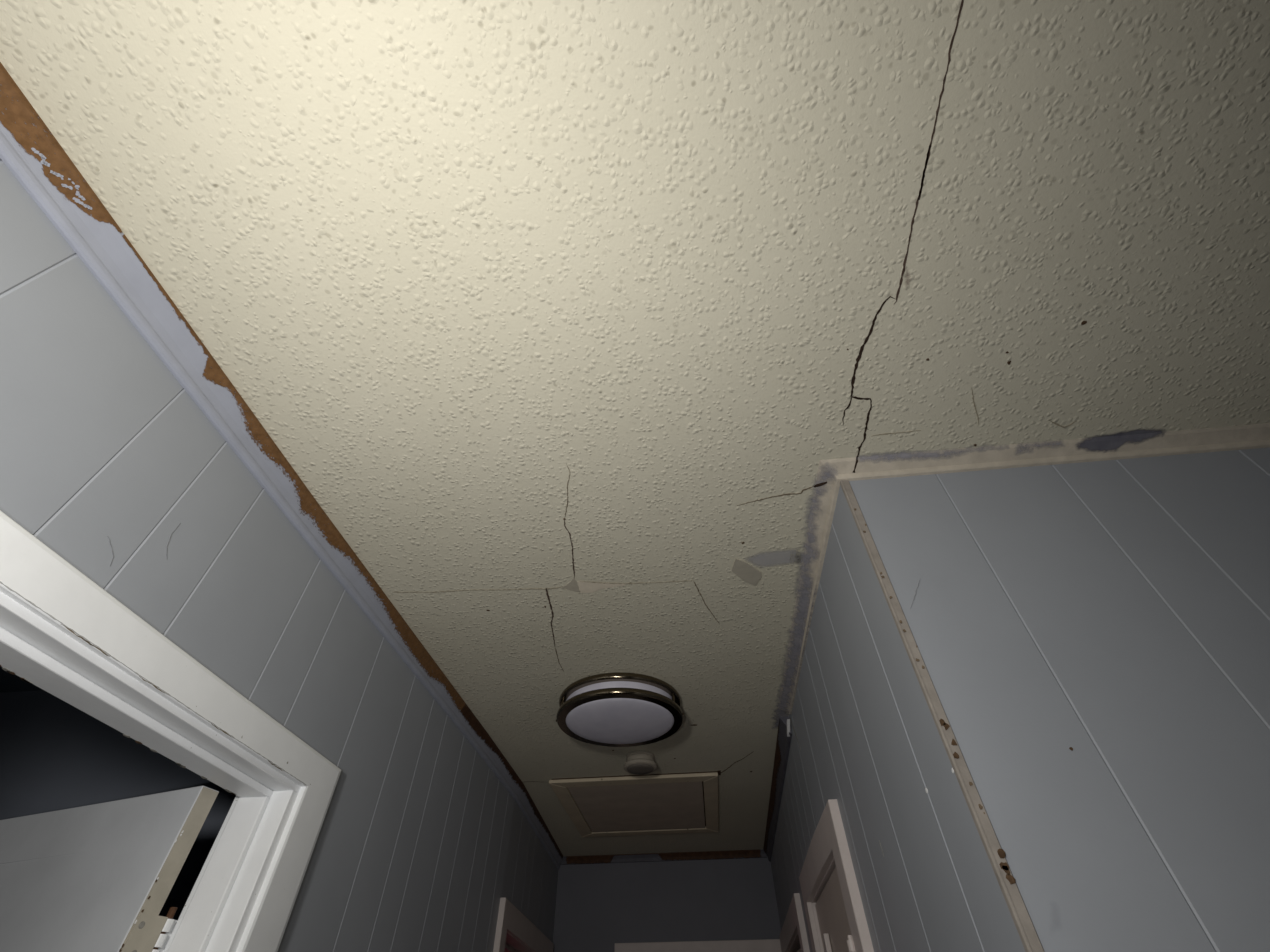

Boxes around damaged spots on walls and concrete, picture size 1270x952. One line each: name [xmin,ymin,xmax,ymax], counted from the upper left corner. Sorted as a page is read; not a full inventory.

crack [0,581,306,785]
peeling [0,62,790,864]
crack [396,466,719,671]
crack [737,0,964,506]